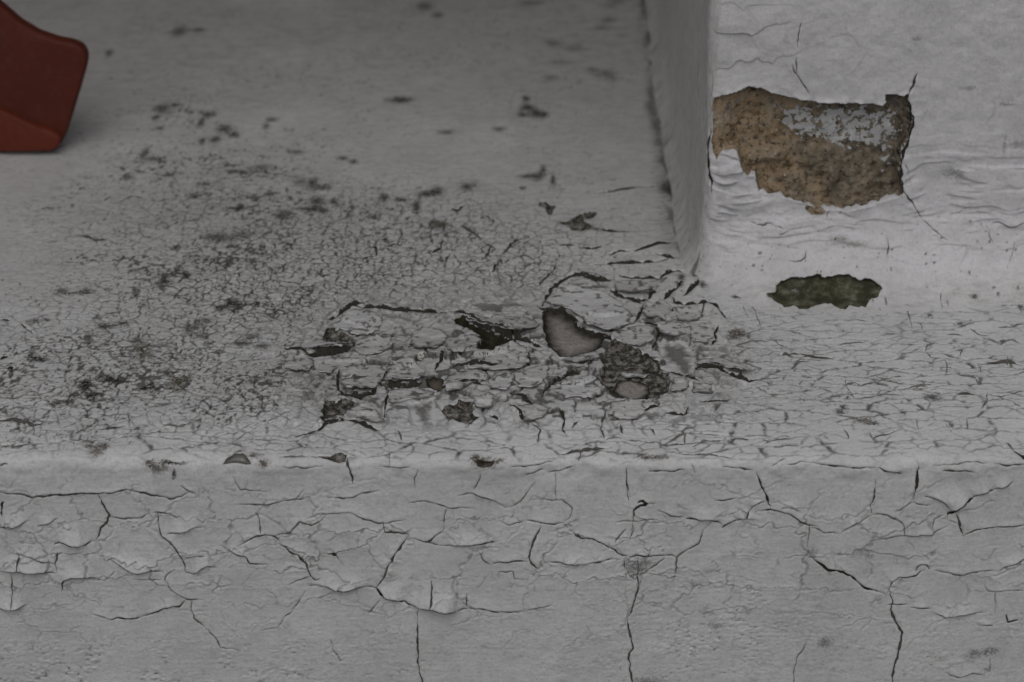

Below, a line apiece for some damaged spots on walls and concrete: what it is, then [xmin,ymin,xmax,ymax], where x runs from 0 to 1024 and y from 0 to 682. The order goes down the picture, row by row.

crack [432,204,519,272]
peeling [283,277,754,427]
crack [601,185,654,193]
spalling [711,86,912,214]
spalling [766,274,883,310]
crack [0,241,1024,682]